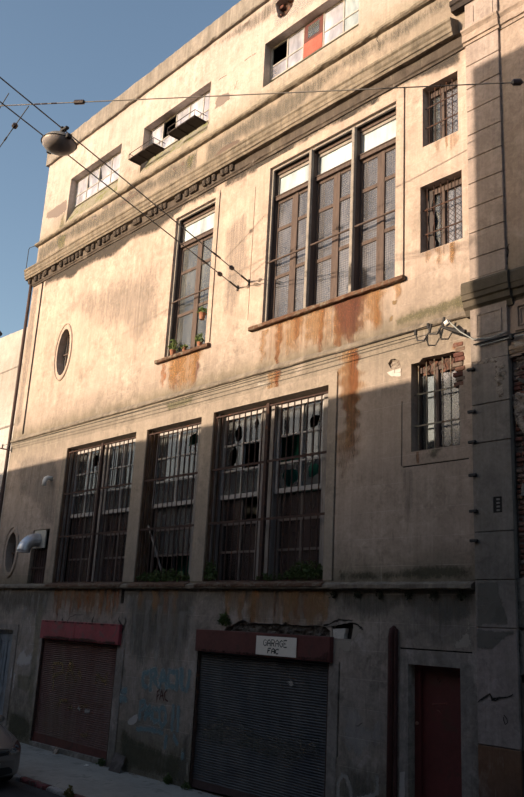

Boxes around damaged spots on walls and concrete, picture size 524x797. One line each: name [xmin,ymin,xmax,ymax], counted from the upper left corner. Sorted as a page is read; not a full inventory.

rust [162,350,200,387]
rust [262,308,324,388]
rust [334,290,381,445]
flaking render [387,360,401,377]
flaking render [421,341,465,389]
flaking render [509,341,524,683]
flaking render [226,619,362,658]
crack [478,693,513,725]